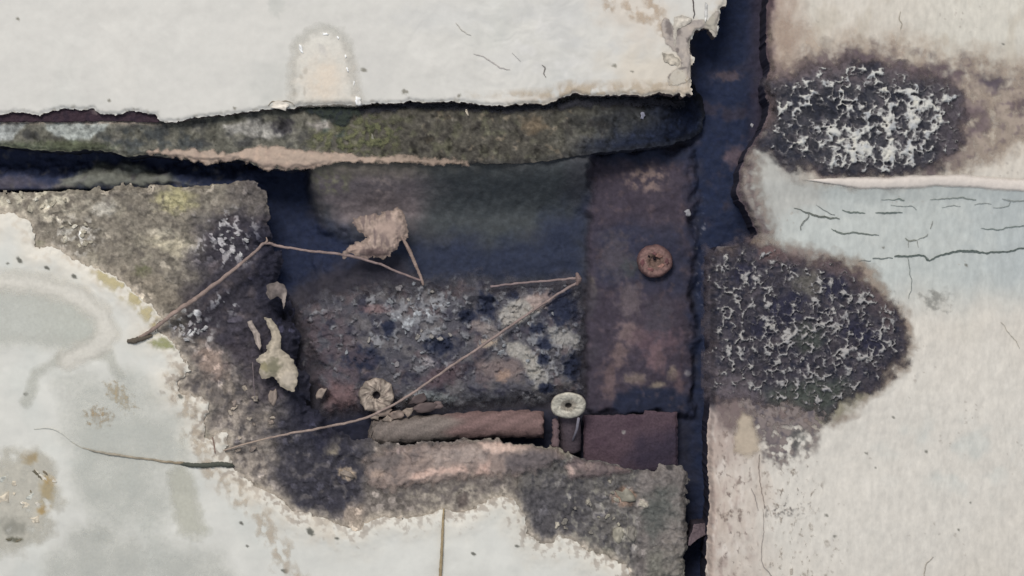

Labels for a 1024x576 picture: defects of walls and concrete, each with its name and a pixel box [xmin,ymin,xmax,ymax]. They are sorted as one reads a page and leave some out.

peeling [270,100,289,111]
peeling [146,146,468,171]
damp [701,39,1024,473]
crack [795,197,1024,294]
spalling [0,180,690,576]